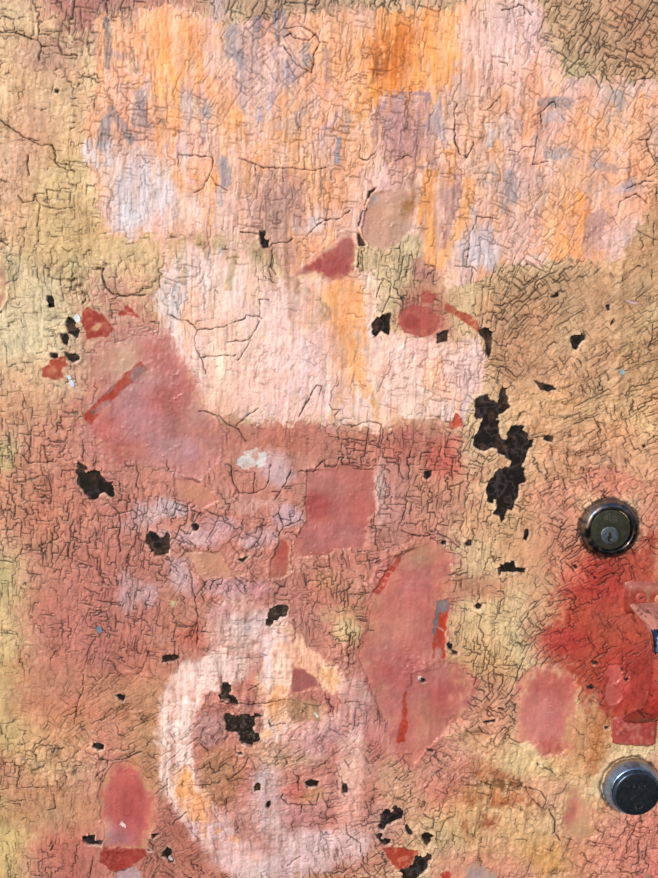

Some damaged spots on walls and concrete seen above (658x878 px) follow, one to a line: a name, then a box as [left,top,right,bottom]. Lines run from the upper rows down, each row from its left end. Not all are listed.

crack [0,16,72,60]
crack [1,120,75,225]
crack [173,299,261,367]
peeling [370,311,391,338]
peeling [50,314,228,513]
peeling [473,382,553,525]
crack [231,457,370,531]
peeling [146,531,250,583]
peeling [357,533,481,771]
peeling [214,681,263,754]
peeling [78,759,161,851]
peeling [377,804,435,878]